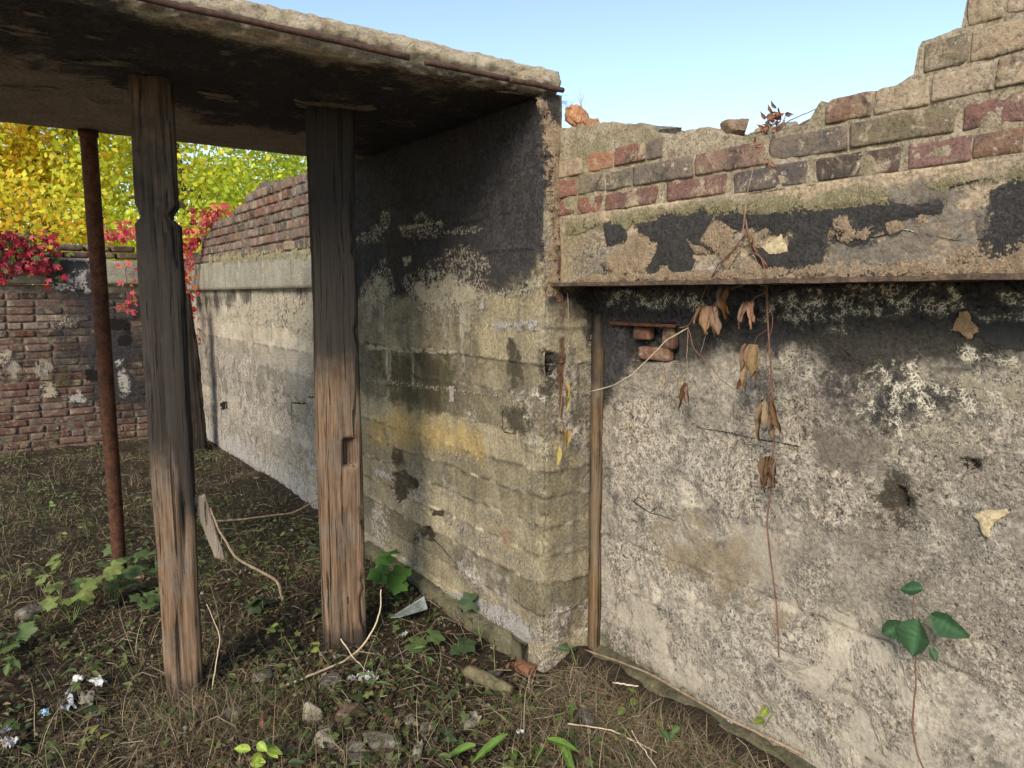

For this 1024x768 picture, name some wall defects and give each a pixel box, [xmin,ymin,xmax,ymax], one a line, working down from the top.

peeling [536,96,1024,297]
damp [356,208,543,339]
damp [0,349,19,377]
damp [33,363,58,398]
damp [820,370,864,408]
damp [950,359,1024,406]